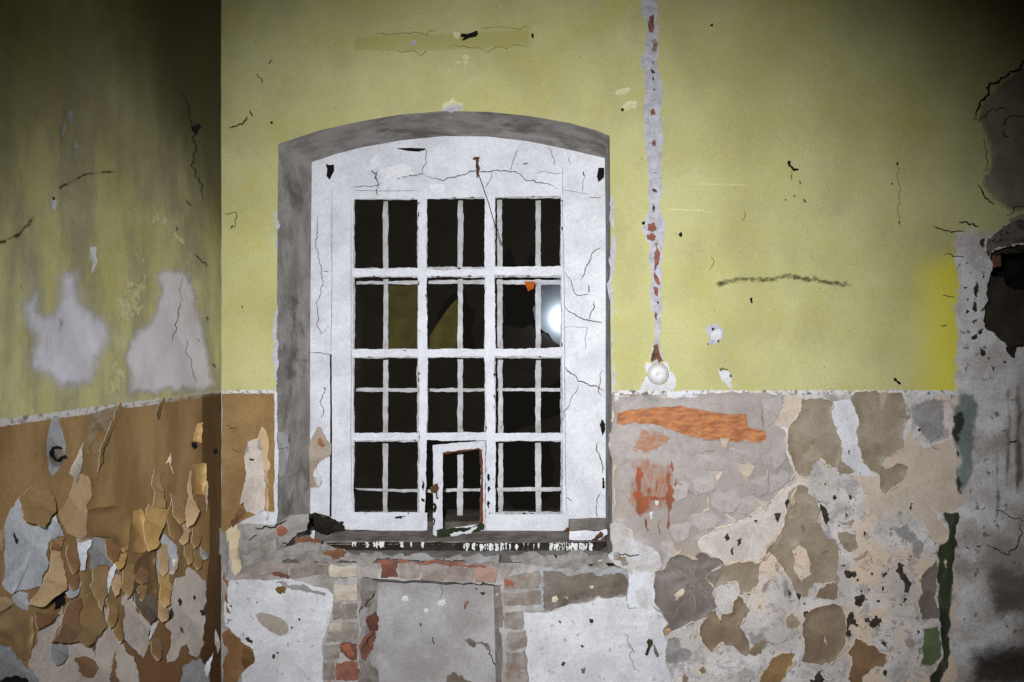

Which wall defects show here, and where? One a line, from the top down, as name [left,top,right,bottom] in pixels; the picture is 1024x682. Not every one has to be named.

flaking render [648,14,658,91]
crack [182,91,204,206]
crack [351,147,601,198]
crack [311,216,330,355]
crack [565,248,601,348]
flaking render [0,270,379,682]
crack [563,367,605,515]
peeling [375,188,940,682]
rust [616,406,766,534]
mould [922,512,959,682]